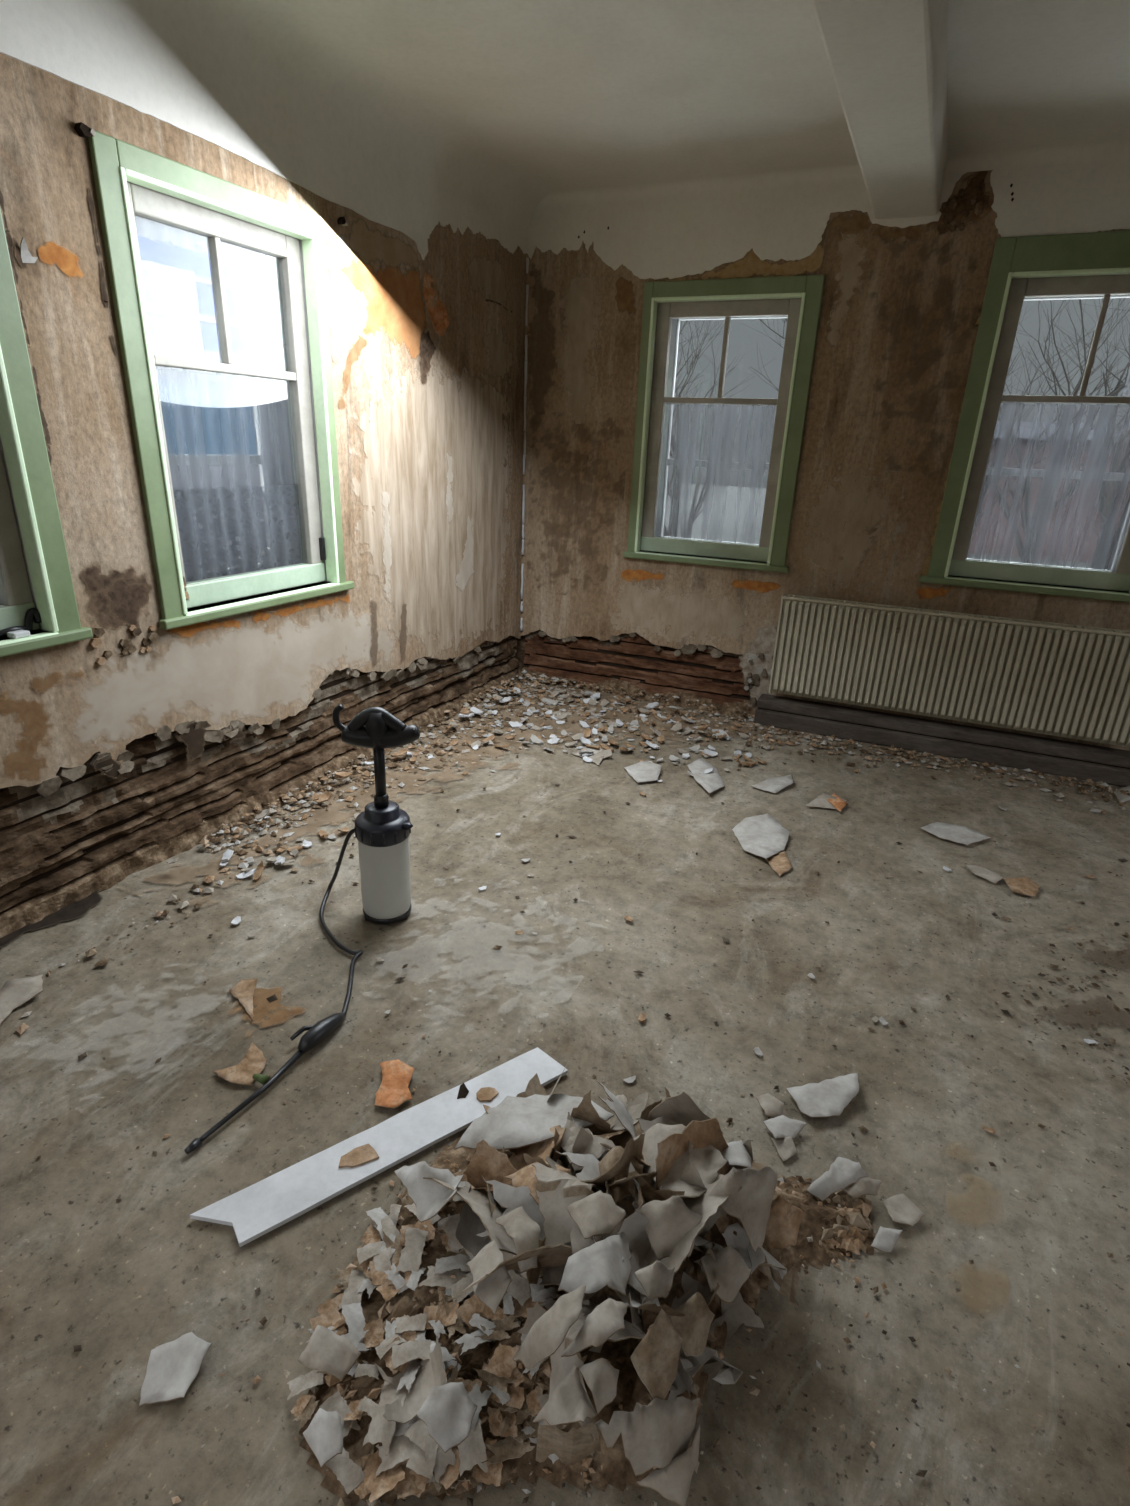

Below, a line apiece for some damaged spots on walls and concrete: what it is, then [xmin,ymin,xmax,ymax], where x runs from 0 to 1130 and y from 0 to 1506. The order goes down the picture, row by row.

flaking render [829,171,994,243]
peeling [325,217,450,409]
water stain [347,270,624,666]
flaking render [0,624,777,938]
flaking render [765,851,792,877]